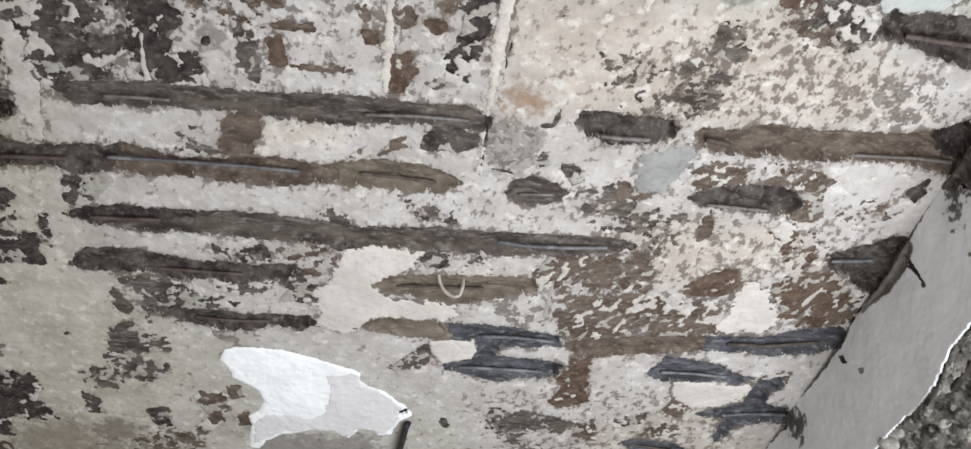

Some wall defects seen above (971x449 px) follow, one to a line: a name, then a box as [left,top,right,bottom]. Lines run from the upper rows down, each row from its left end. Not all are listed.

spalling [768,0,971,70]
spalling [0,0,535,205]
peeling [540,109,562,129]
spalling [574,19,753,145]
peeling [871,74,948,128]
peeling [0,187,53,266]
spalling [504,174,570,207]
peeling [561,163,585,186]
spalling [686,119,971,242]
spalling [61,180,913,449]
peeling [0,369,61,449]
spalling [877,324,971,449]